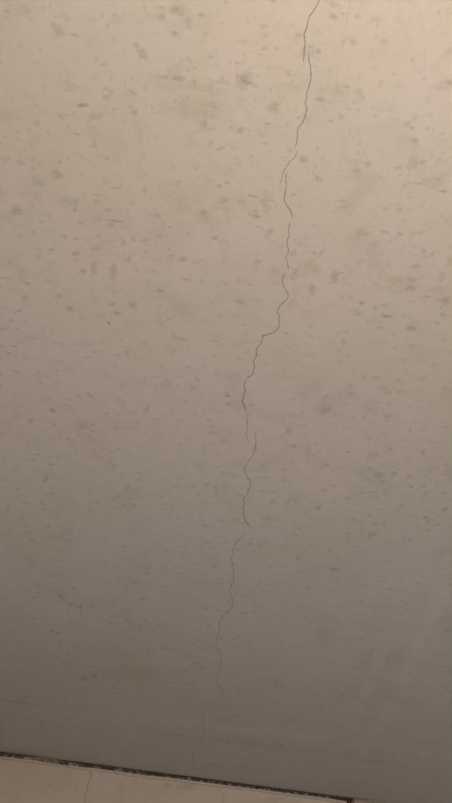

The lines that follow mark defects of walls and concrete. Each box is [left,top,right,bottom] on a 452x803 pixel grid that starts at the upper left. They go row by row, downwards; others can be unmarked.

crack [0,758,127,803]
crack [142,0,380,803]